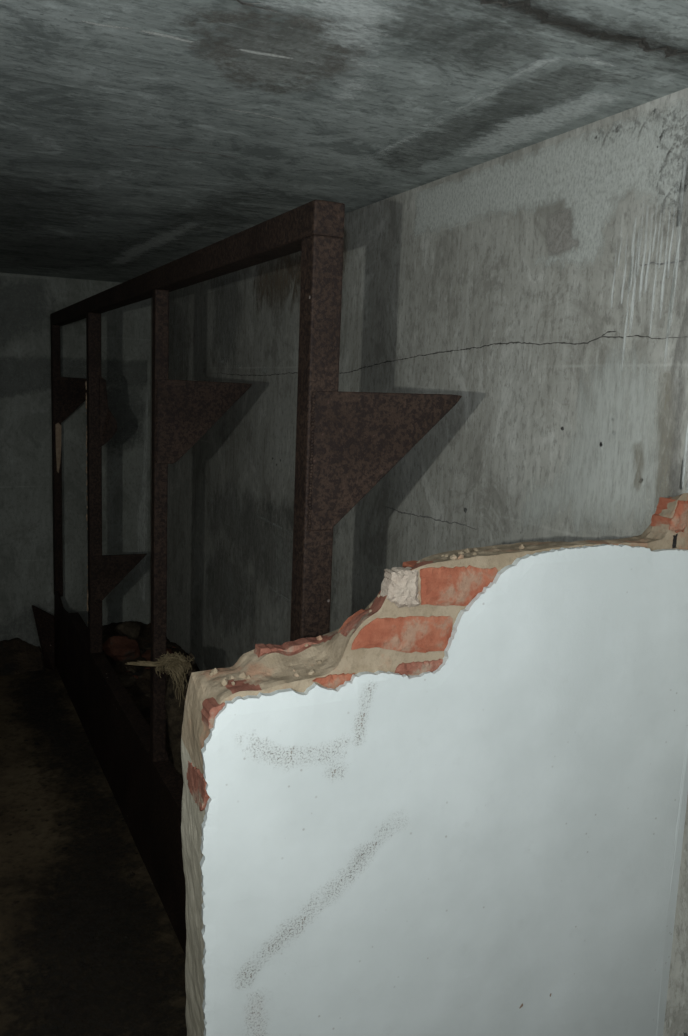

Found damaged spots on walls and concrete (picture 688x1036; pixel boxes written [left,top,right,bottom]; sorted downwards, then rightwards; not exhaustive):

damp [265,0,400,52]
crack [339,331,687,374]